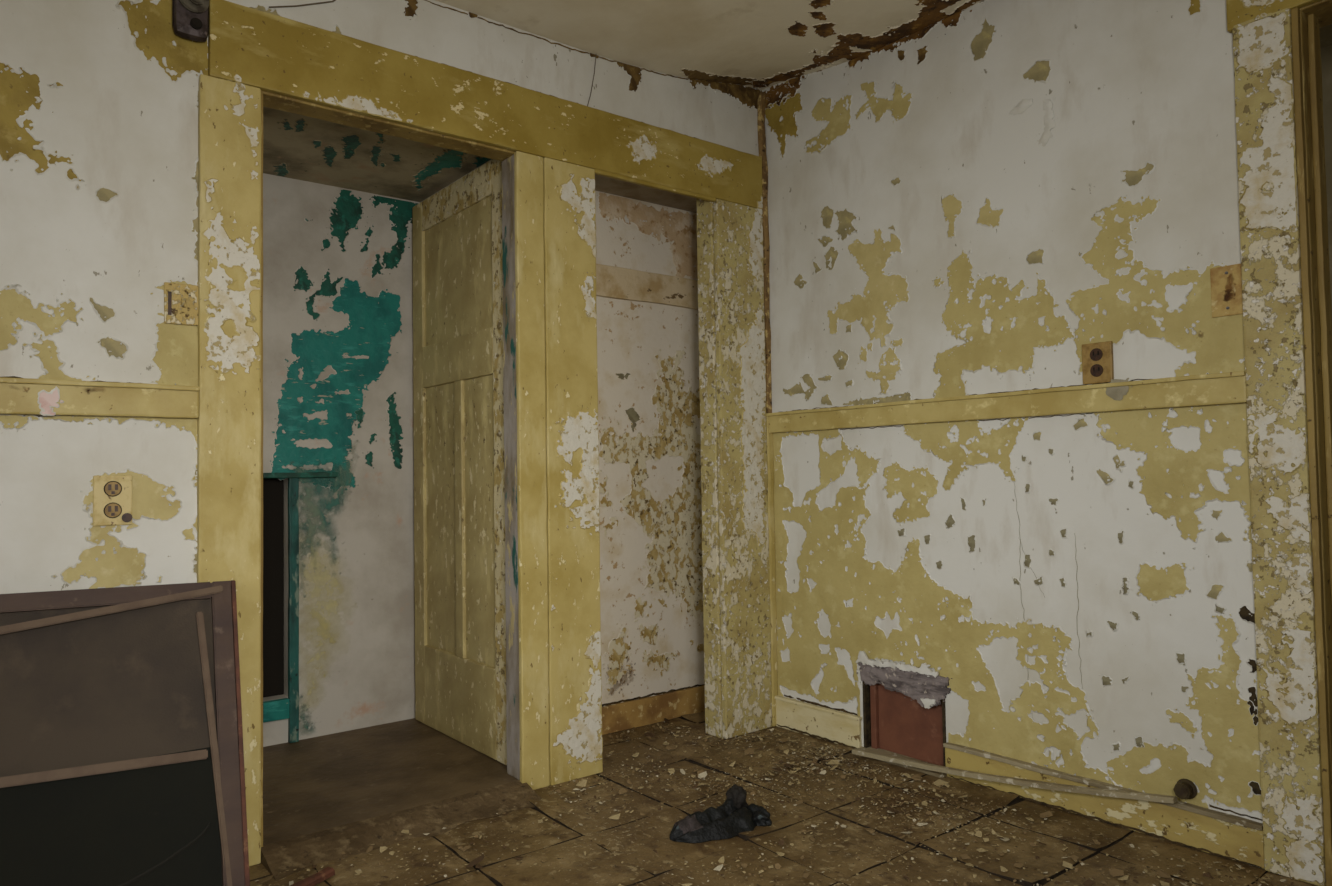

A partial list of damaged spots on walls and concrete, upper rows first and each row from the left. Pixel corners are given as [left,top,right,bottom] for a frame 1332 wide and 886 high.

peeling [0,62,119,204]
peeling [277,90,413,168]
peeling [680,0,997,158]
peeling [1232,0,1299,239]
peeling [0,284,129,381]
peeling [150,157,261,386]
peeling [263,149,490,698]
peeling [558,173,698,319]
peeling [783,206,912,406]
peeling [932,161,1245,398]
peeling [51,468,197,589]
peeling [331,302,1324,886]